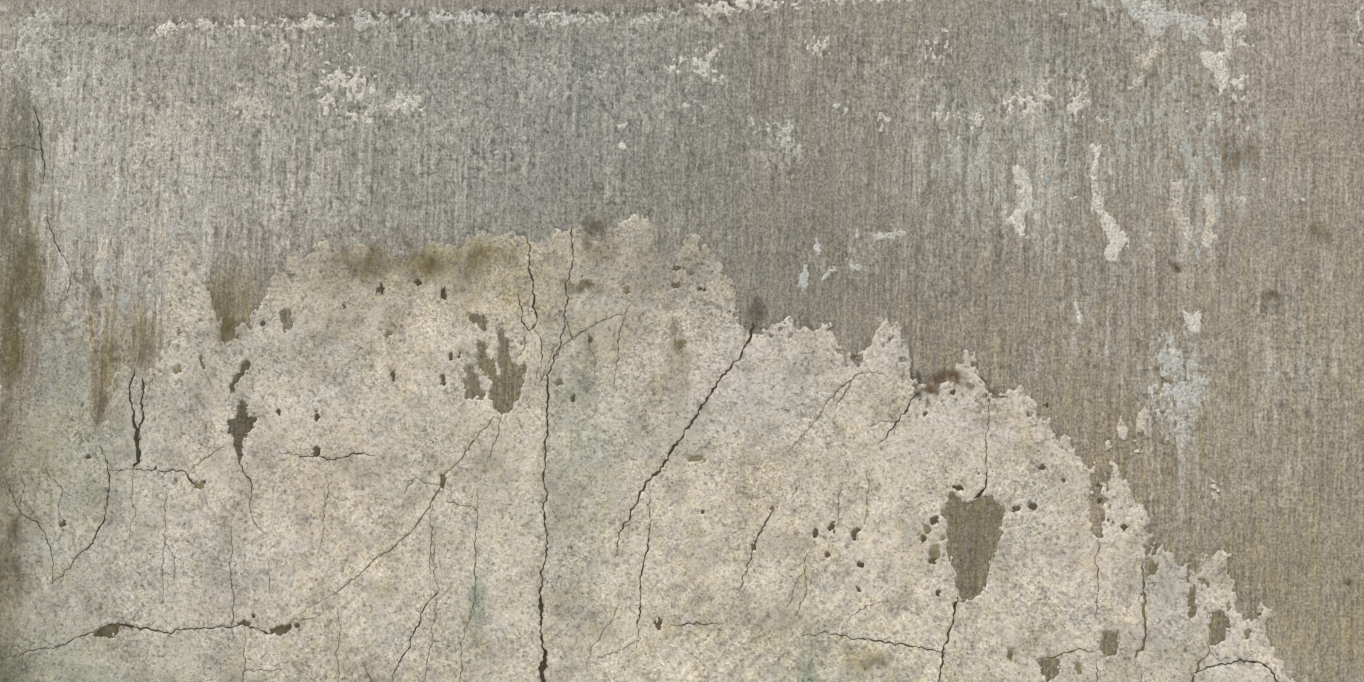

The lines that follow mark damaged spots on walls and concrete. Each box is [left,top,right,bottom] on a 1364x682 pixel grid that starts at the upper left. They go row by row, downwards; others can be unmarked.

spalling [227,352,257,465]
crack [0,369,502,682]
spalling [440,312,527,415]
crack [516,225,631,682]
crack [585,322,755,668]
spalling [812,521,861,541]
spalling [921,485,1038,603]
crack [786,554,959,682]
spalling [1037,657,1082,682]
crack [1134,561,1147,682]
spalling [1208,601,1232,646]
crack [1191,639,1279,682]